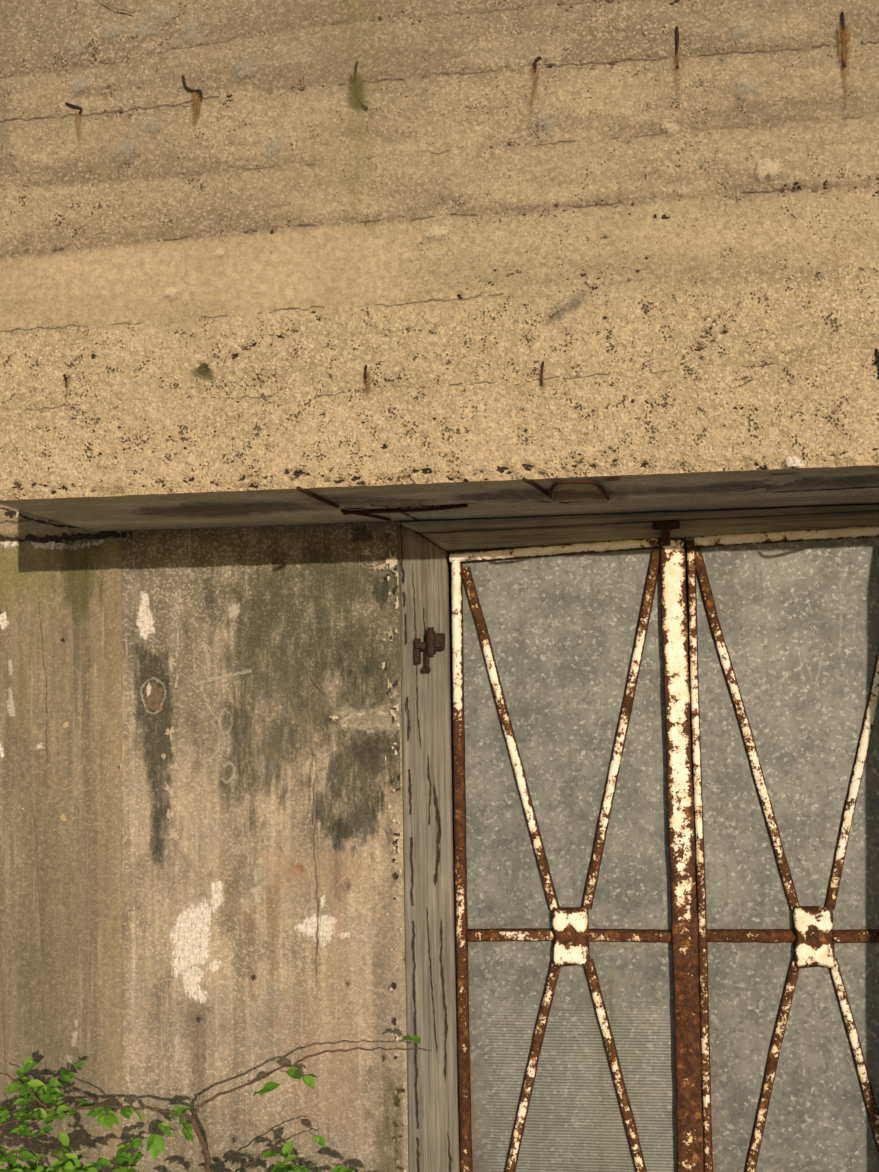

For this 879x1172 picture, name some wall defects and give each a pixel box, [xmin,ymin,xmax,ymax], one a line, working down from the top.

corrosion [192,92,201,122]
damp [134,591,173,866]
damp [219,548,400,948]
damp [169,881,224,1003]